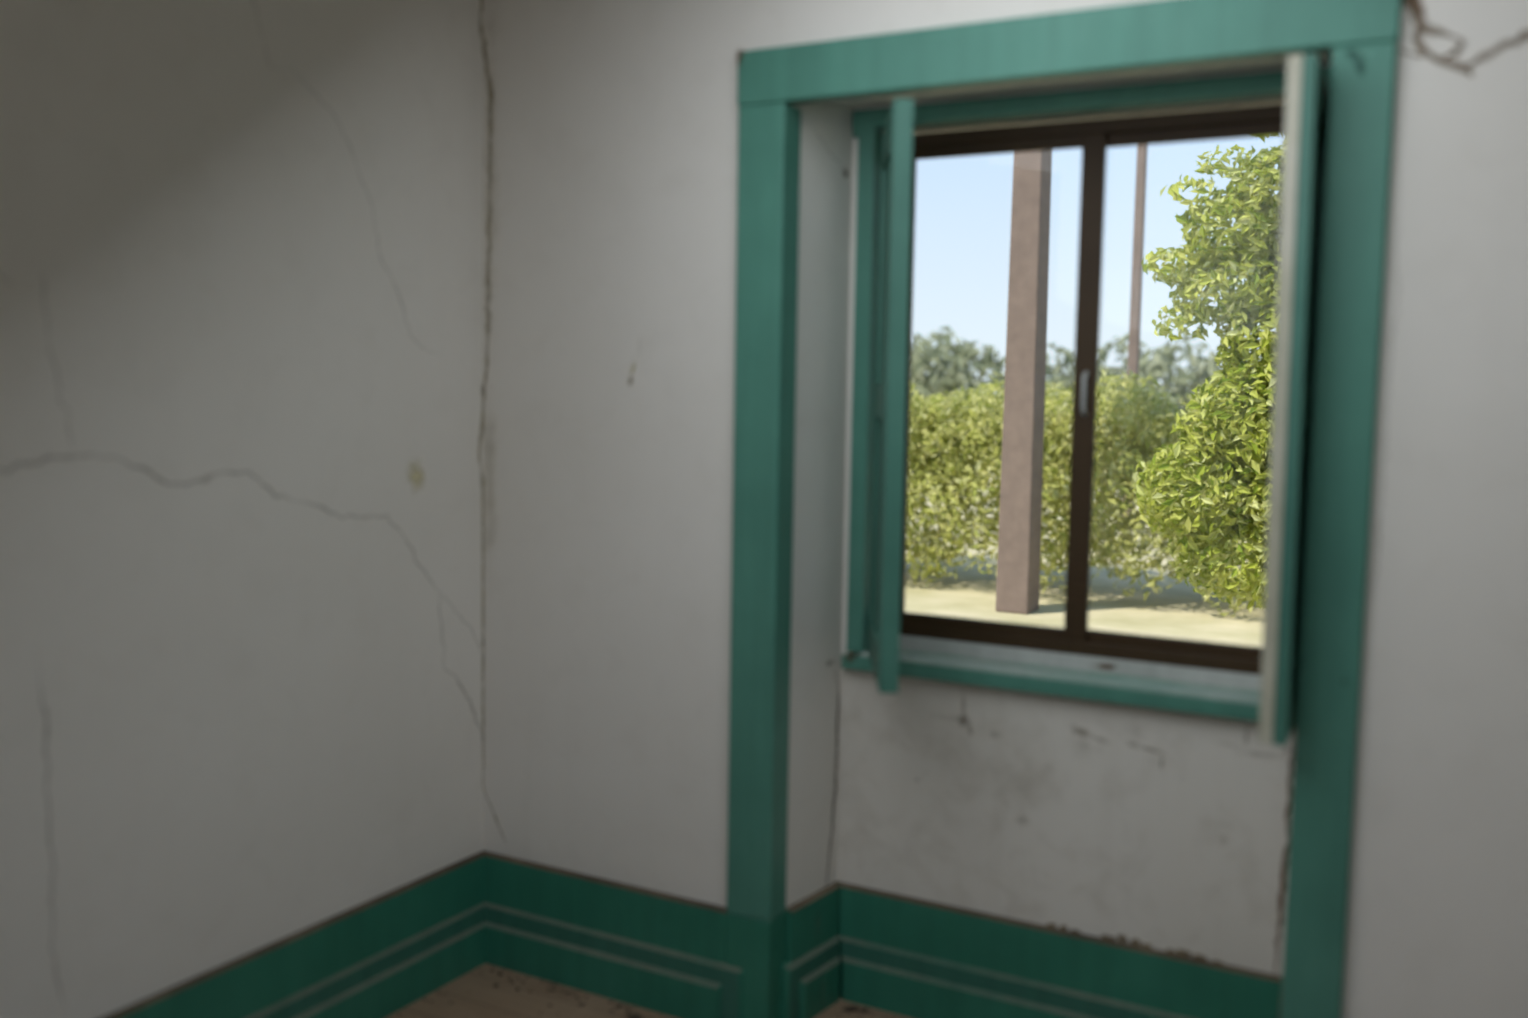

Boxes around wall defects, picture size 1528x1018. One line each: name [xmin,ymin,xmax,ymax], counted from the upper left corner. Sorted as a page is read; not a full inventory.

crack [1398,0,1528,76]
crack [478,0,506,843]
crack [1274,727,1295,975]